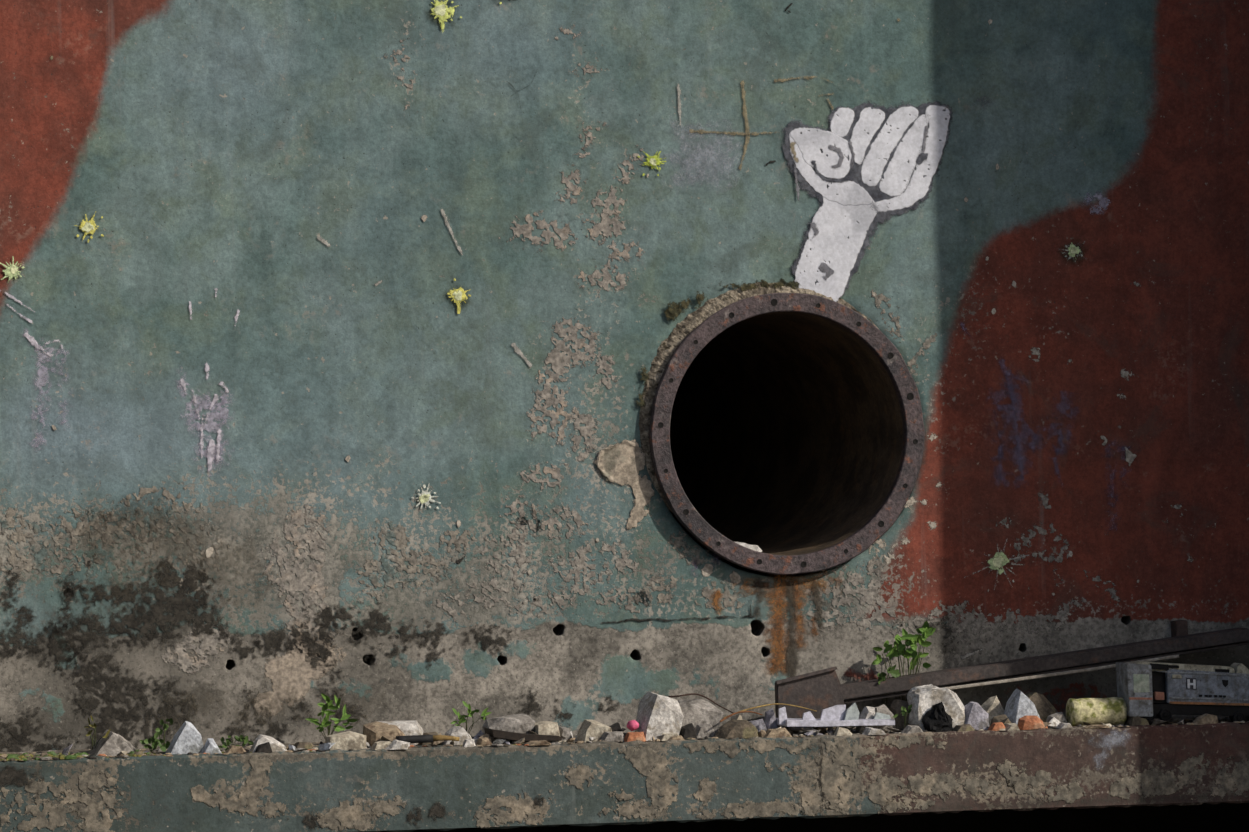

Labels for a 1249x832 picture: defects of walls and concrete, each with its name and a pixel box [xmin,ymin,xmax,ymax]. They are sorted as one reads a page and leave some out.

peeling [499,121,649,298]
peeling [355,317,752,622]
peeling [801,493,1087,643]
corrosion [740,574,842,674]
leakage [0,558,519,788]
leakage [508,690,573,721]
peeling [0,765,126,832]
peeling [190,755,289,820]
peeling [317,792,407,831]
peeling [474,789,556,828]
peeling [598,735,1249,820]